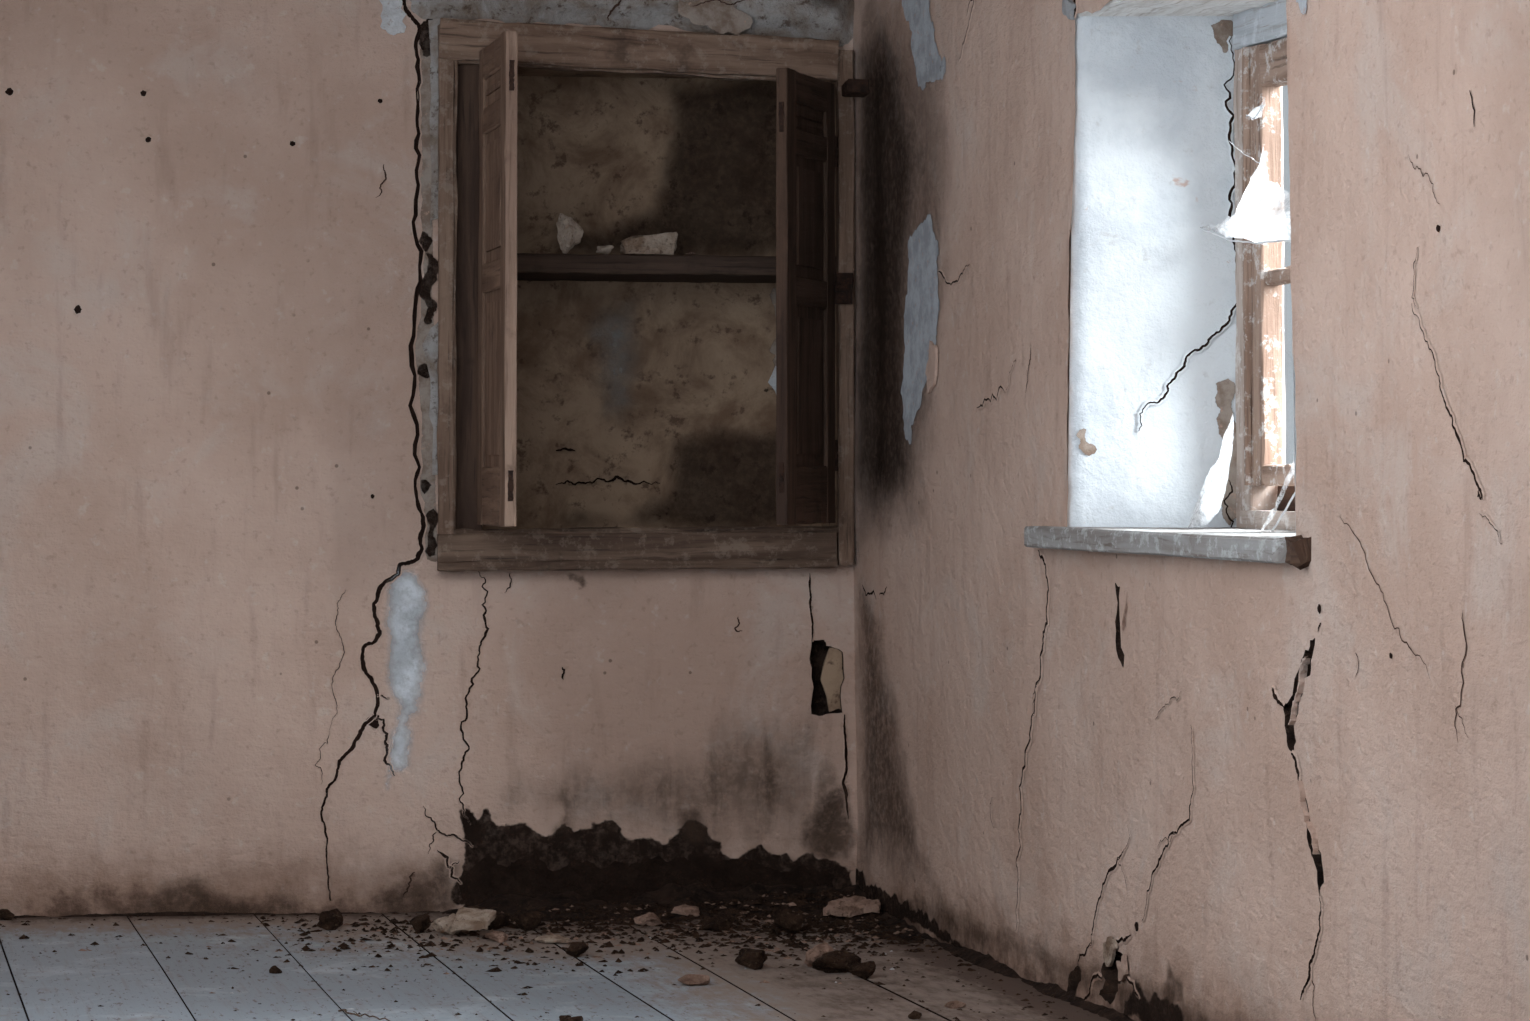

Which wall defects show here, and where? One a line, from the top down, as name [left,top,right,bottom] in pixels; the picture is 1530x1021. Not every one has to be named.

peeling [902,0,946,91]
crack [313,0,427,901]
flaking render [379,0,440,562]
peeling [901,214,940,444]
crack [1411,247,1501,545]
flaking render [388,573,425,768]
crack [406,571,513,892]
flaking render [809,640,844,716]
crack [1090,690,1195,948]
crack [1271,623,1324,1020]
flaking render [1067,933,1140,1004]
damp [1083,970,1202,1021]